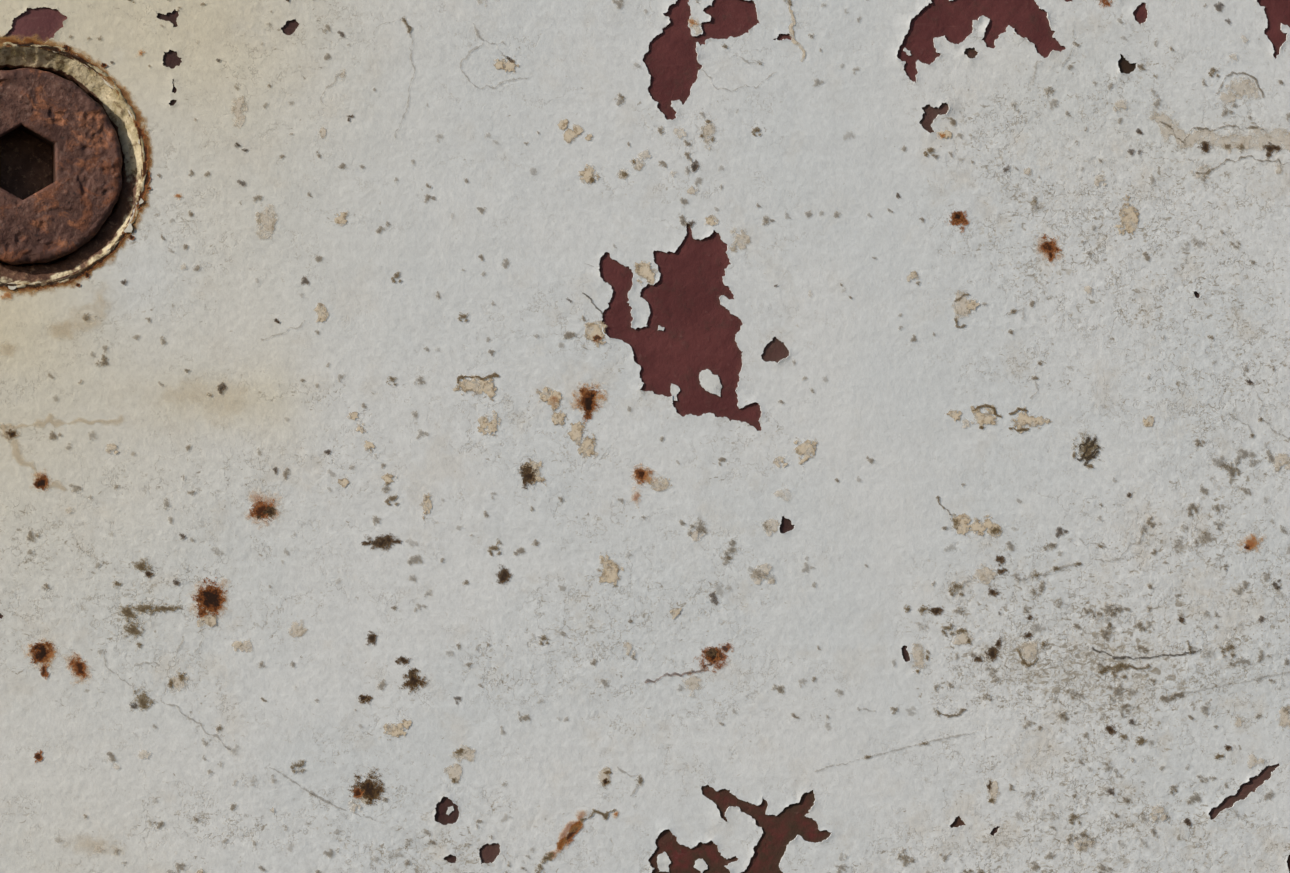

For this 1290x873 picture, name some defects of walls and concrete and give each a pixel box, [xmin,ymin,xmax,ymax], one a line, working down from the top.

peeling [643,0,759,120]
peeling [897,0,1066,83]
peeling [1257,0,1290,59]
rust [0,36,152,299]
peeling [599,223,762,431]
rust [573,385,607,422]
rust [248,499,275,520]
rust [191,577,228,618]
rust [28,640,56,679]
rust [645,643,734,696]
peeling [1209,763,1279,820]
peeling [648,785,832,873]